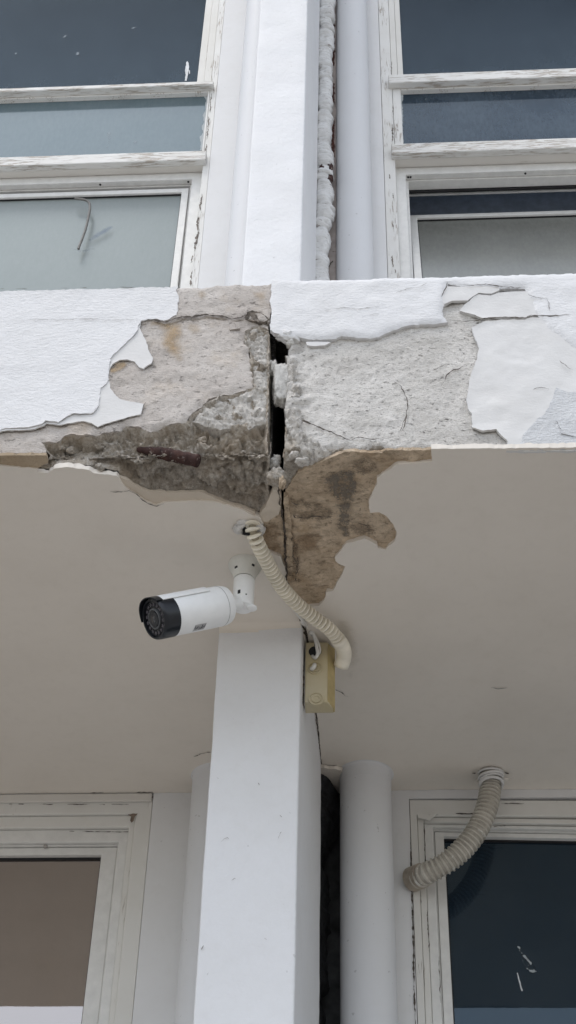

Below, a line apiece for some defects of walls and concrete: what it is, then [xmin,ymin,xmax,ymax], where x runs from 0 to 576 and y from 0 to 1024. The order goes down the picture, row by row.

peeling [0,197,511,604]
leakage [295,460,376,537]